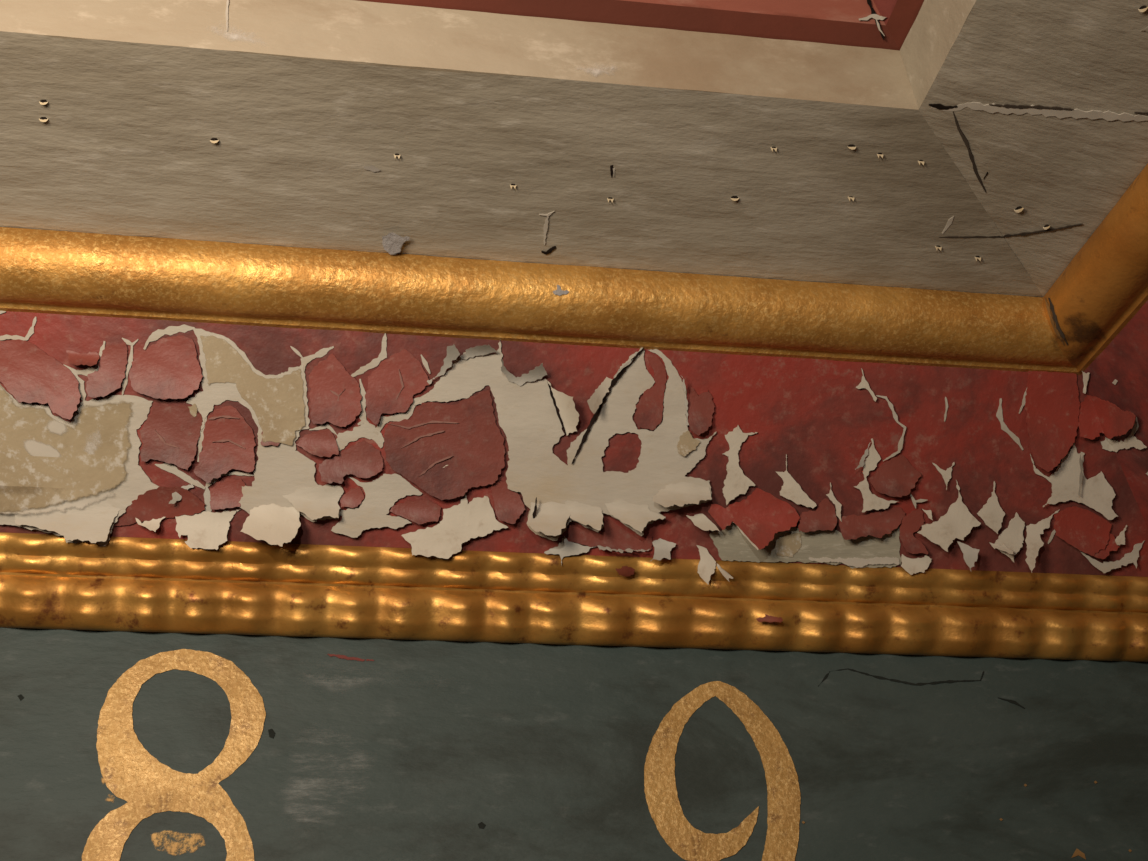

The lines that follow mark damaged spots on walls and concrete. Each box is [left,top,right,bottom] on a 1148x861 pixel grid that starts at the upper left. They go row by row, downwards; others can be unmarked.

crack [859,0,886,40]
crack [929,102,1148,193]
peeling [0,324,1147,584]